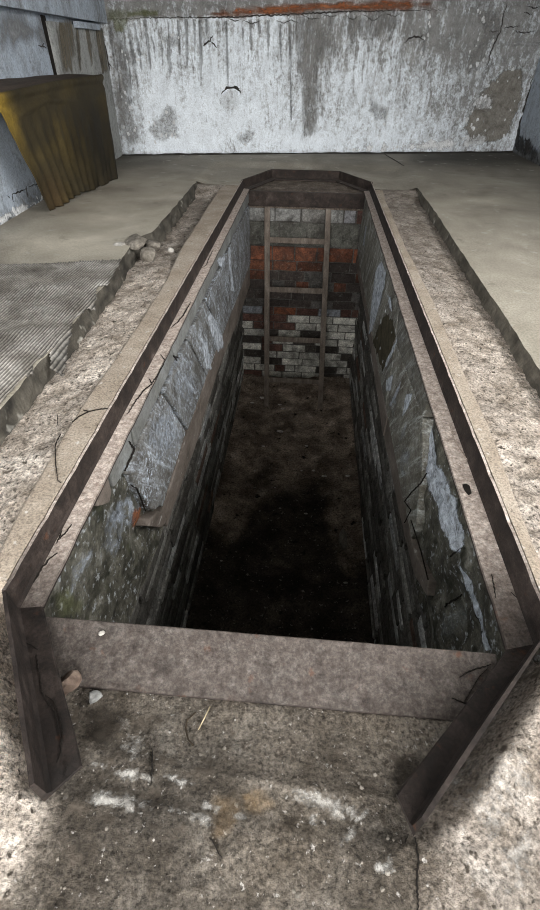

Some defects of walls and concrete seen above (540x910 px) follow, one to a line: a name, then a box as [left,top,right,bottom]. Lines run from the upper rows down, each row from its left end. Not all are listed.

crack [103,9,441,71]
leakage [243,17,335,136]
corrosion [212,0,430,17]
crack [486,4,538,67]
crack [54,354,178,483]
spalling [44,208,505,662]
crack [404,473,429,580]
crack [403,834,420,910]